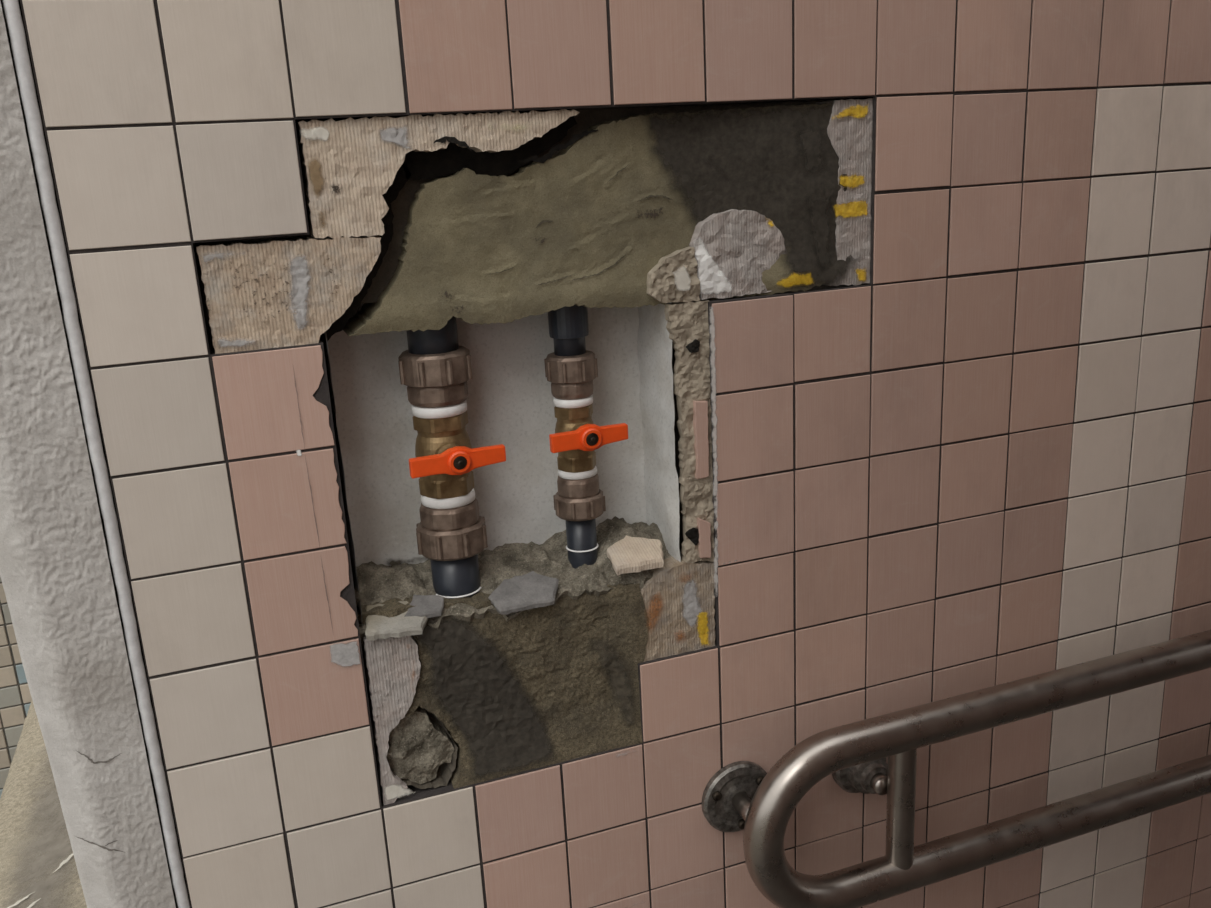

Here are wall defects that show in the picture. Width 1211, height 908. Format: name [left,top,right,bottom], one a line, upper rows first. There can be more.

spalling [197,109,579,354]
spalling [816,98,873,286]
spalling [641,209,786,662]
crack [77,751,122,764]
crack [77,837,123,852]
spalling [362,635,458,805]